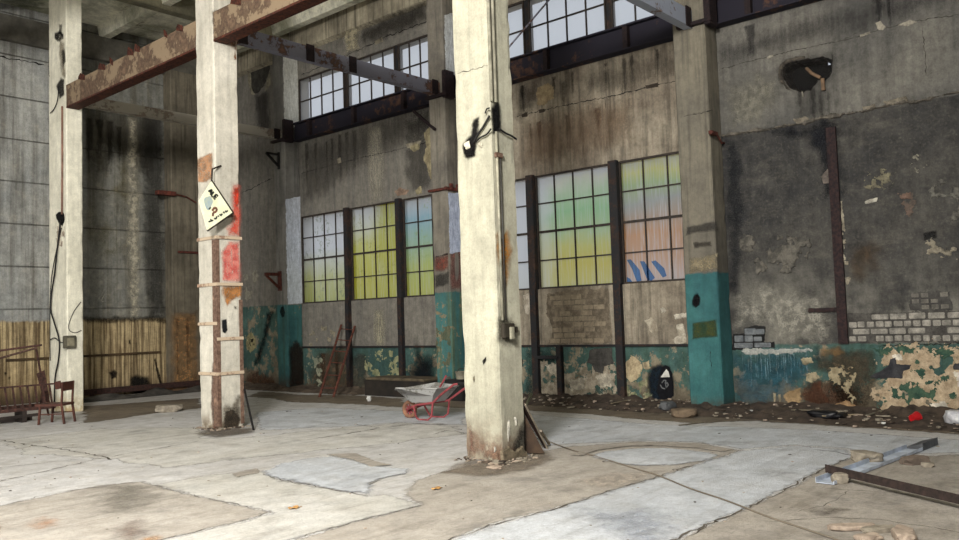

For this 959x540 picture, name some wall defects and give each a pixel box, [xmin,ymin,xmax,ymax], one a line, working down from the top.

spalling [778,49,834,101]
water stain [781,119,837,173]
water stain [85,108,164,315]
peeling [864,168,916,217]
peeling [925,238,957,260]
water stain [742,291,824,335]
water stain [172,315,197,382]
peeling [306,325,336,387]
peeling [364,349,408,376]
peeling [540,356,652,399]
peeling [847,291,959,410]
water stain [513,422,525,451]